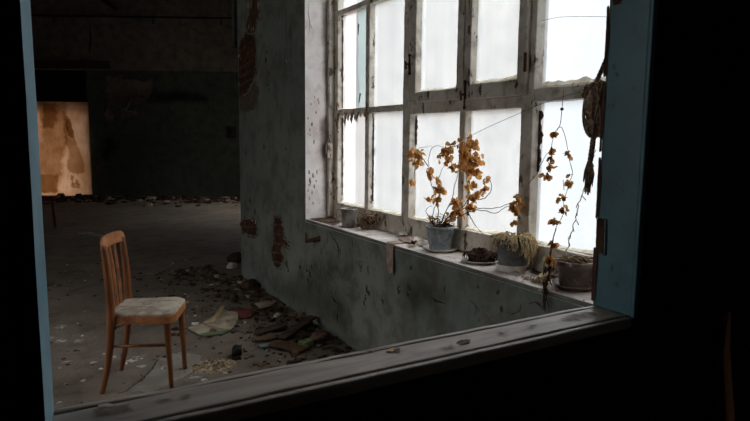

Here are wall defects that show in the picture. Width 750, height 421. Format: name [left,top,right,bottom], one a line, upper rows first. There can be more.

spalling [238,0,269,113]
spalling [240,196,258,239]
spalling [271,213,291,271]